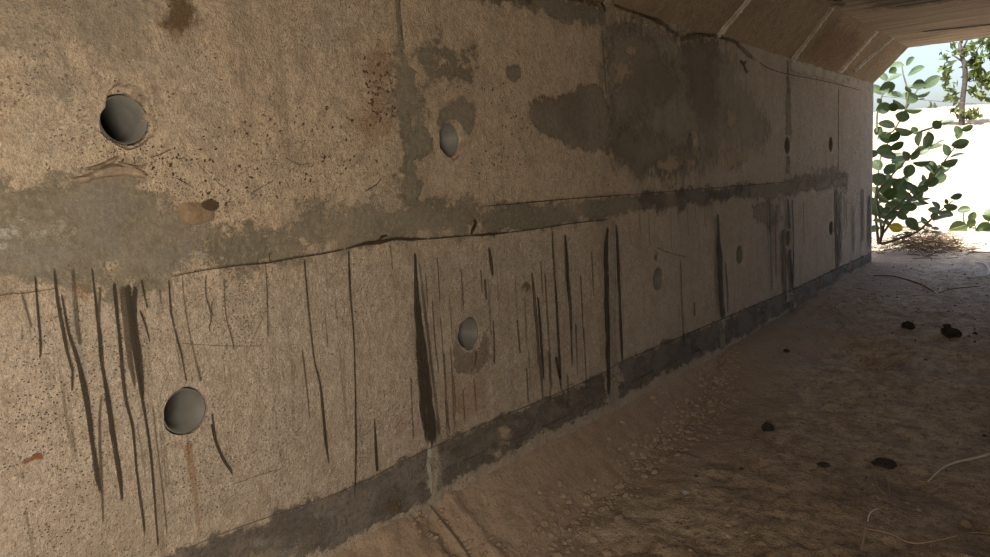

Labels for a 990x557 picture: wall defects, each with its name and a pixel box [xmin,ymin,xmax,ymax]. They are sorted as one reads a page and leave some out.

water stain [412,27,479,93]
water stain [0,226,21,250]
crack [172,181,793,277]
water stain [21,277,42,358]
water stain [54,268,123,522]
water stain [113,280,167,545]
water stain [159,281,202,381]
water stain [168,181,872,557]